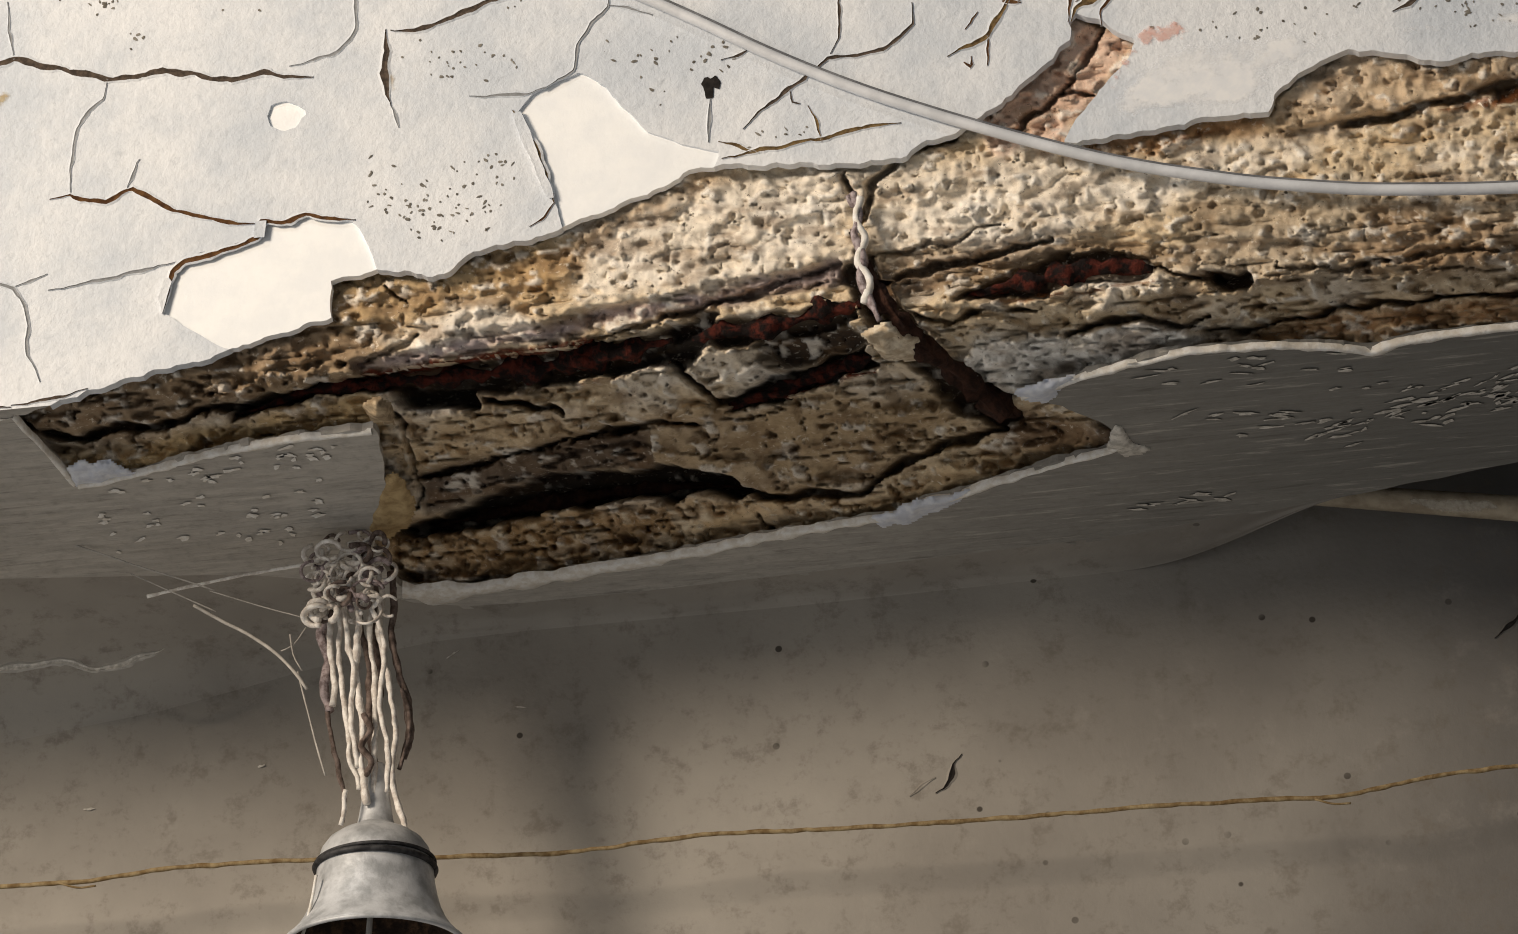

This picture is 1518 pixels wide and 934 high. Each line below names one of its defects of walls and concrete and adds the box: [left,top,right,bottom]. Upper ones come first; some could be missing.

crack [947,0,1021,70]
crack [1067,0,1113,27]
crack [1392,0,1419,12]
spalling [1419,0,1518,28]
crack [469,0,652,227]
crack [718,0,915,159]
crack [0,0,507,409]
corrosion [235,229,1022,424]
spalling [0,18,1518,605]
corrosion [969,257,1153,297]
corrosion [433,480,743,529]